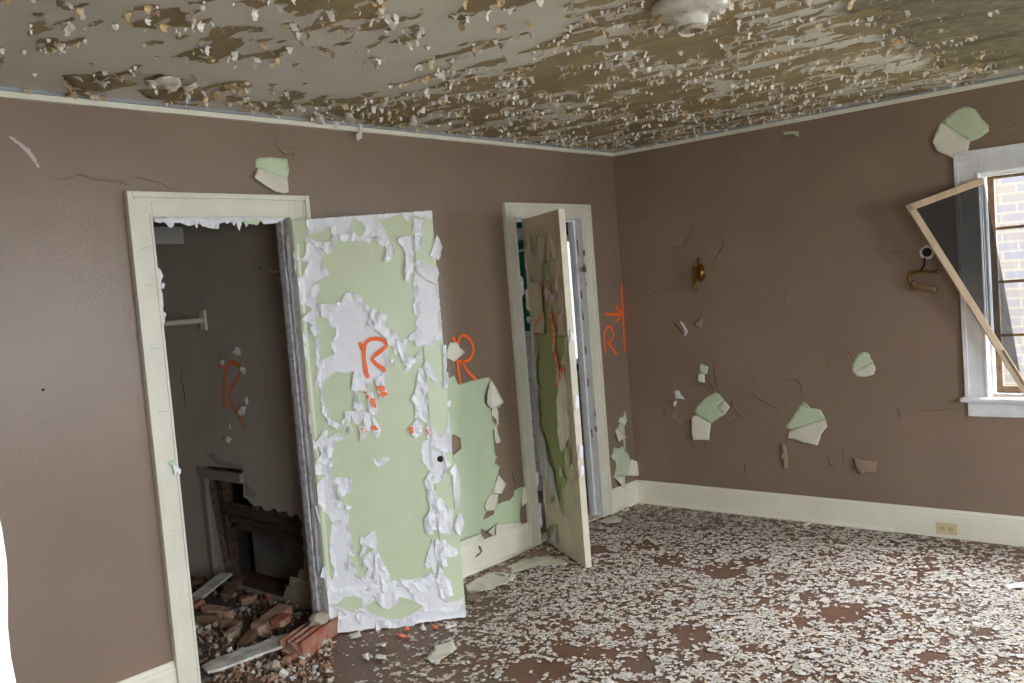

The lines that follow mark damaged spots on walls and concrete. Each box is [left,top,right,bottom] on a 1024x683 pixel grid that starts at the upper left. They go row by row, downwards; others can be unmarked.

peeling [0,0,1024,152]
peeling [933,106,989,161]
crack [47,171,179,217]
peeling [254,157,289,193]
peeling [295,211,584,633]
peeling [610,411,639,490]
peeling [691,392,730,441]
crack [706,362,803,425]
peeling [780,402,827,469]
peeling [851,352,876,377]
hole [213,467,307,590]